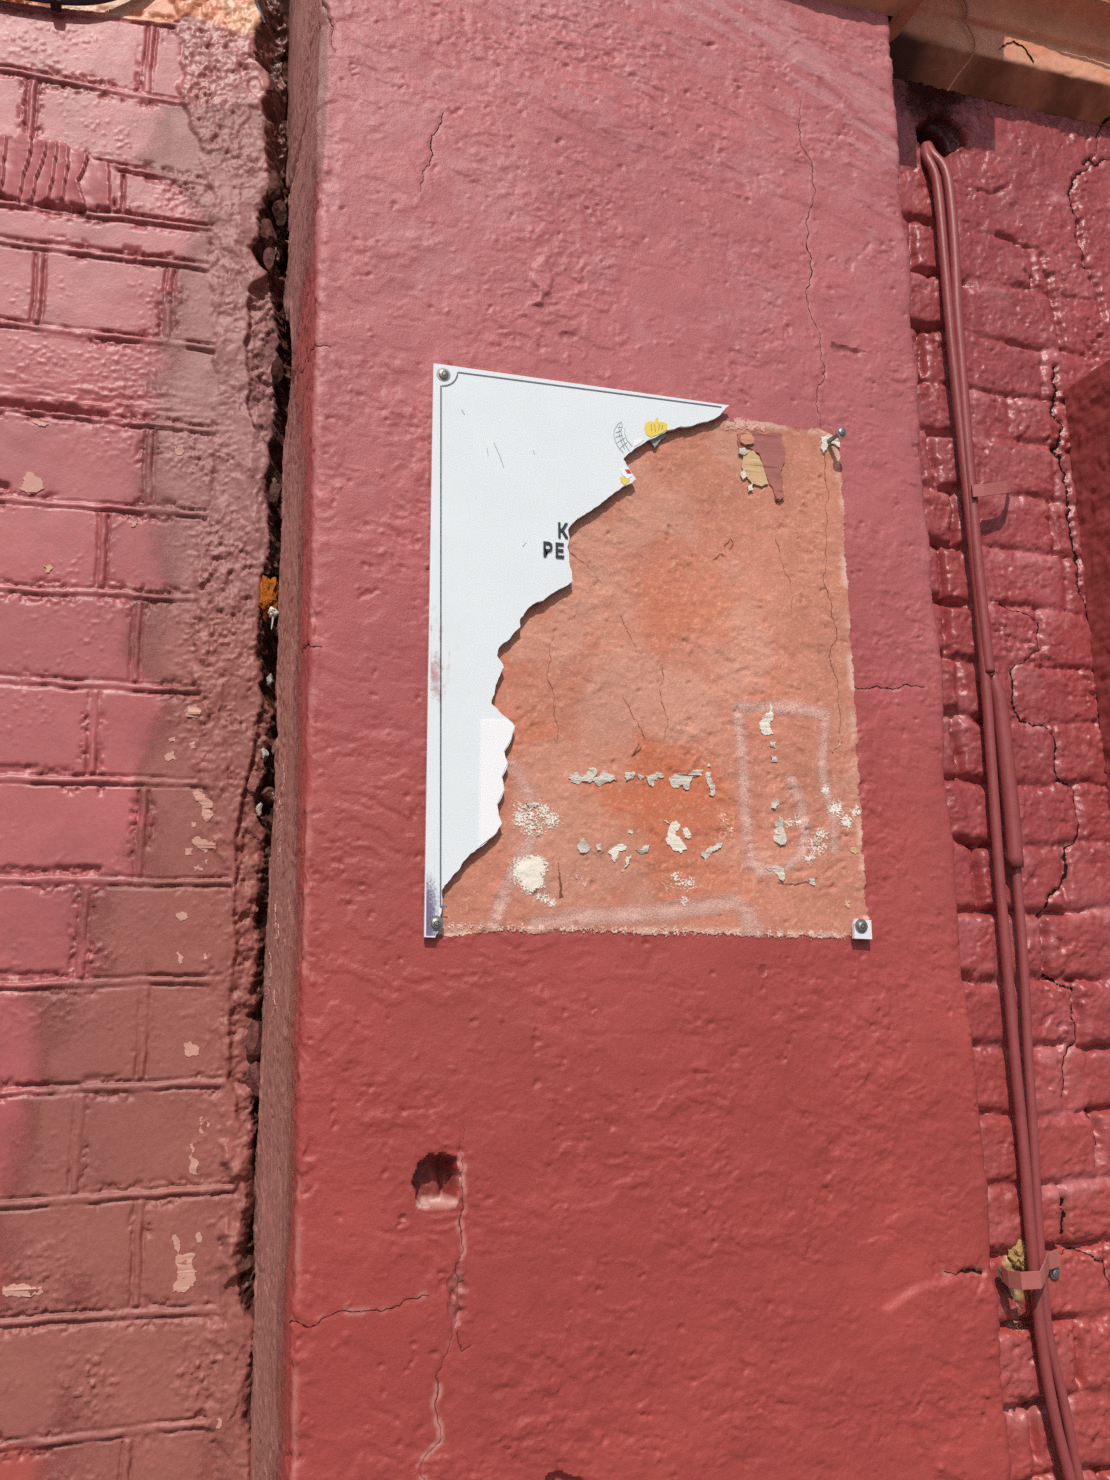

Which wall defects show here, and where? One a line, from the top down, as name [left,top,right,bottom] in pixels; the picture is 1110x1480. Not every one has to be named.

crack [999,40,1034,63]
crack [260,0,331,385]
crack [1067,116,1110,273]
crack [1050,367,1087,616]
crack [266,600,321,702]
crack [247,737,278,846]
crack [990,600,1079,926]
crack [245,1020,263,1096]
crack [1041,974,1096,1167]
spalling [398,1152,461,1222]
crack [289,1122,470,1480]
spalling [545,1470,584,1480]